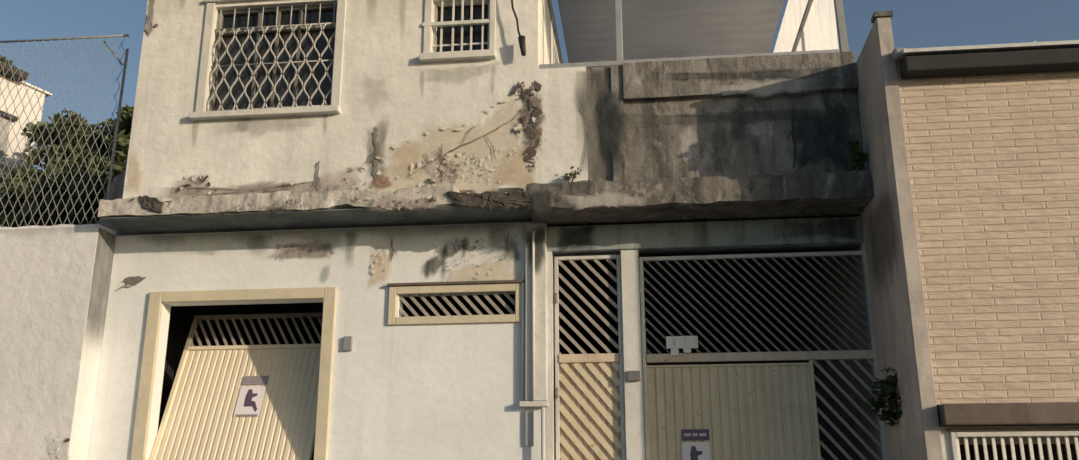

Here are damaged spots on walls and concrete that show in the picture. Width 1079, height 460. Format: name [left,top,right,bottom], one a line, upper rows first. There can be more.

leakage [669,69,806,96]
peeling [312,80,548,211]
leakage [579,70,623,168]
leakage [678,115,699,165]
leakage [722,110,846,168]
spalling [129,173,211,213]
leakage [569,193,640,208]
leakage [387,227,545,287]
leakage [559,226,594,250]
peeling [116,276,146,291]
peeling [48,438,70,460]